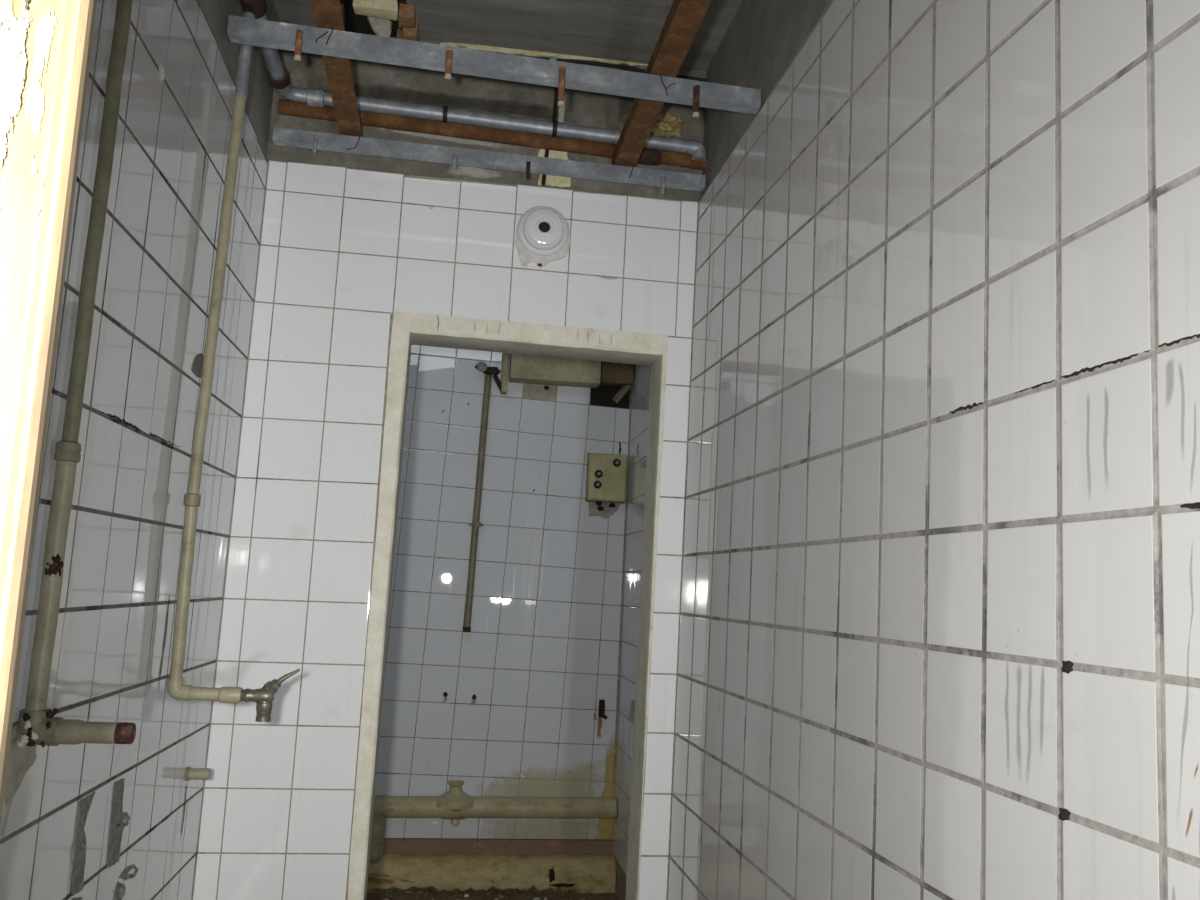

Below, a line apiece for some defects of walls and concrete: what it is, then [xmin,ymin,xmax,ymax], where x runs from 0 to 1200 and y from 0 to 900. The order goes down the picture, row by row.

spalling [353,0,420,42]
spalling [440,42,648,66]
peeling [0,0,57,188]
peeling [636,148,662,166]
water stain [490,746,616,797]
spalling [70,792,95,900]
spalling [106,778,139,900]
water stain [506,819,613,839]